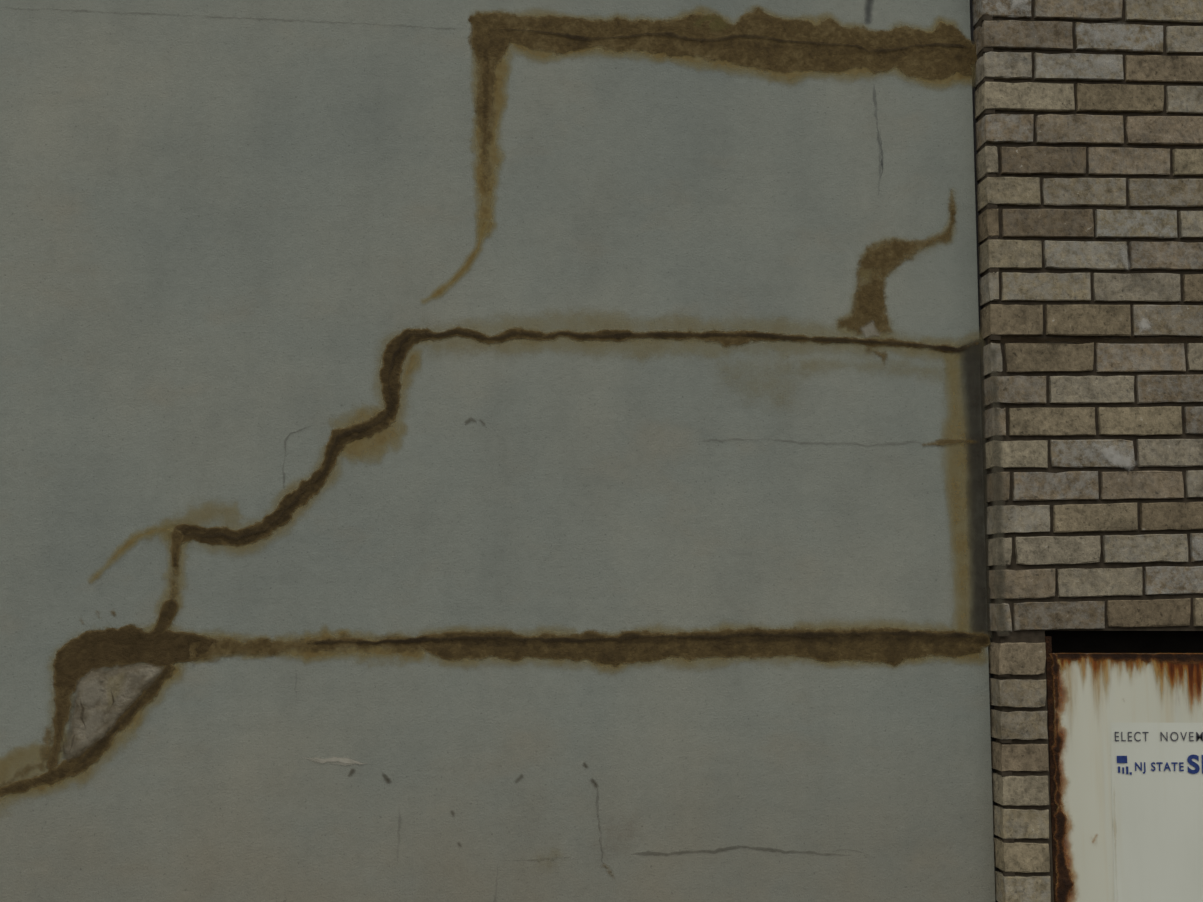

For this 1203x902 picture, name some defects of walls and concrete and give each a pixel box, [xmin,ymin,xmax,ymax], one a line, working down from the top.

crack [513,0,970,52]
damp [423,7,977,302]
crack [389,330,518,371]
crack [551,332,1203,352]
crack [186,400,393,540]
damp [0,197,1005,803]
crack [923,438,975,446]
crack [354,630,978,644]
spalling [62,664,163,761]
corrosion [1050,653,1203,902]